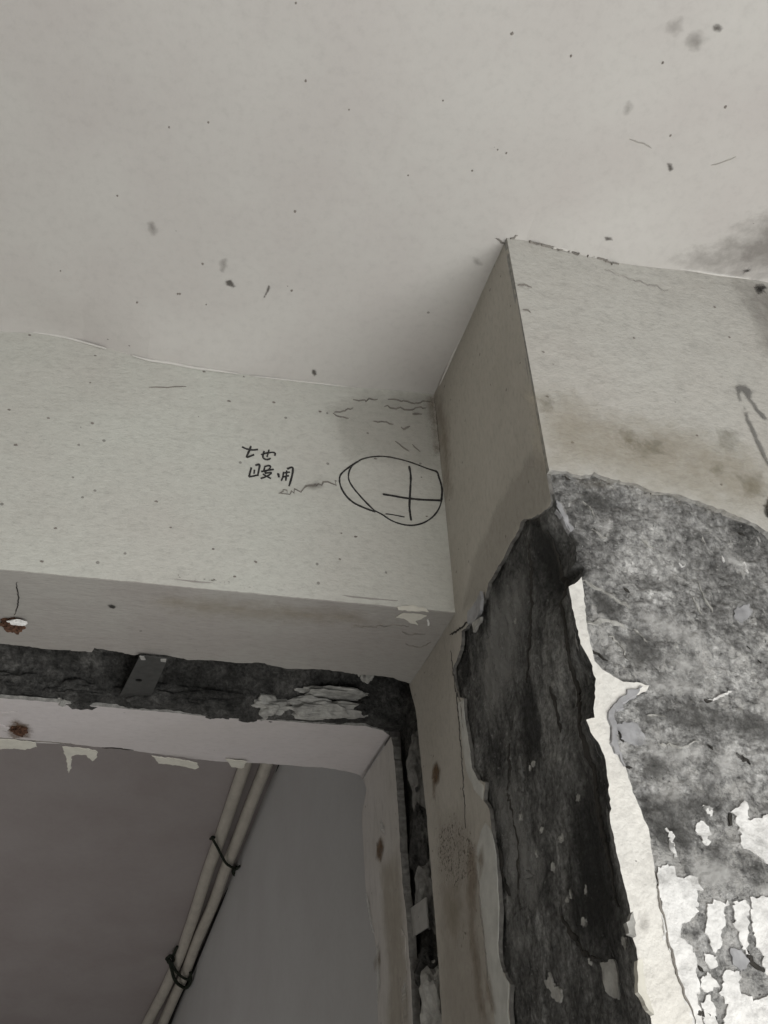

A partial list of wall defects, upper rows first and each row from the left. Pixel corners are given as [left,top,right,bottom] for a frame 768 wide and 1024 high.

water stain [737,386,768,464]
crack [280,480,337,495]
peeling [396,605,430,626]
peeling [62,746,98,772]
peeling [152,755,199,769]
flaking render [457,474,768,1024]